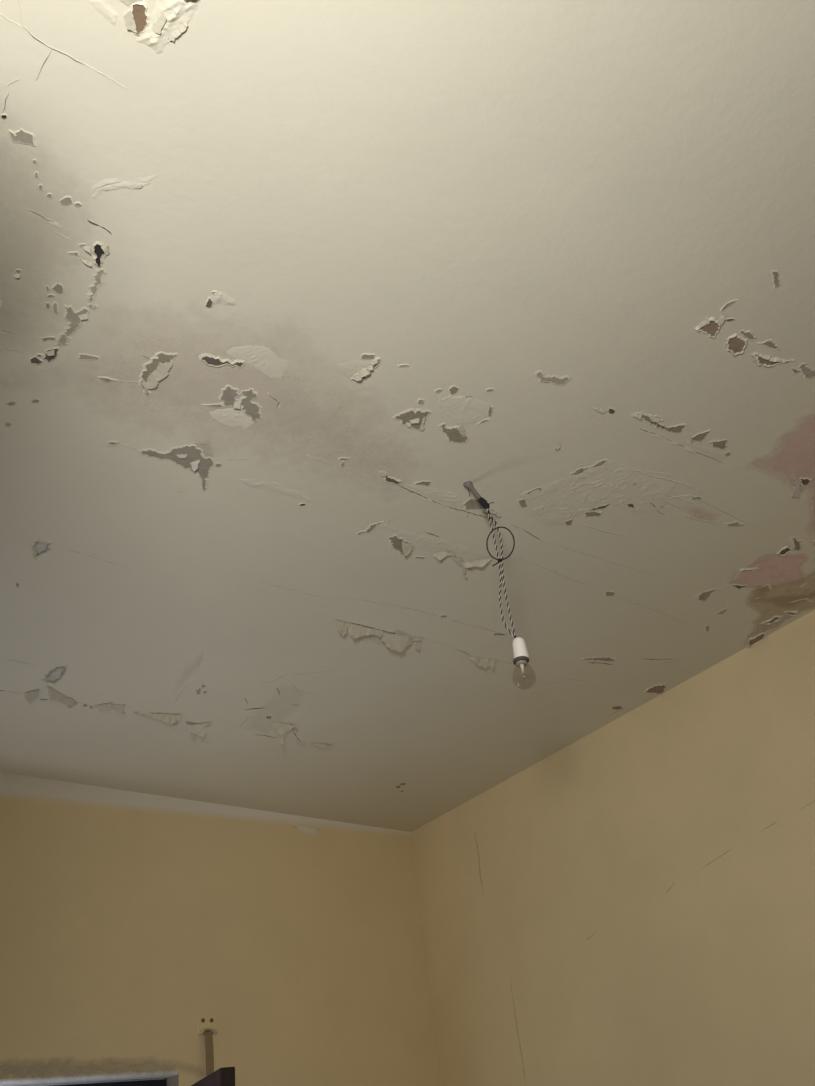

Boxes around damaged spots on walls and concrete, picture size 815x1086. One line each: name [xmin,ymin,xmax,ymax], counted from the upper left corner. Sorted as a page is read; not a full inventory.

crack [0,0,126,119]
peeling [89,0,199,56]
crack [26,208,113,240]
peeling [29,241,109,365]
peeling [695,299,815,380]
peeling [103,441,249,491]
peeling [392,408,471,444]
peeling [631,411,731,464]
damp [762,419,815,485]
peeling [355,514,492,578]
damp [735,555,815,637]
peeling [24,664,125,714]